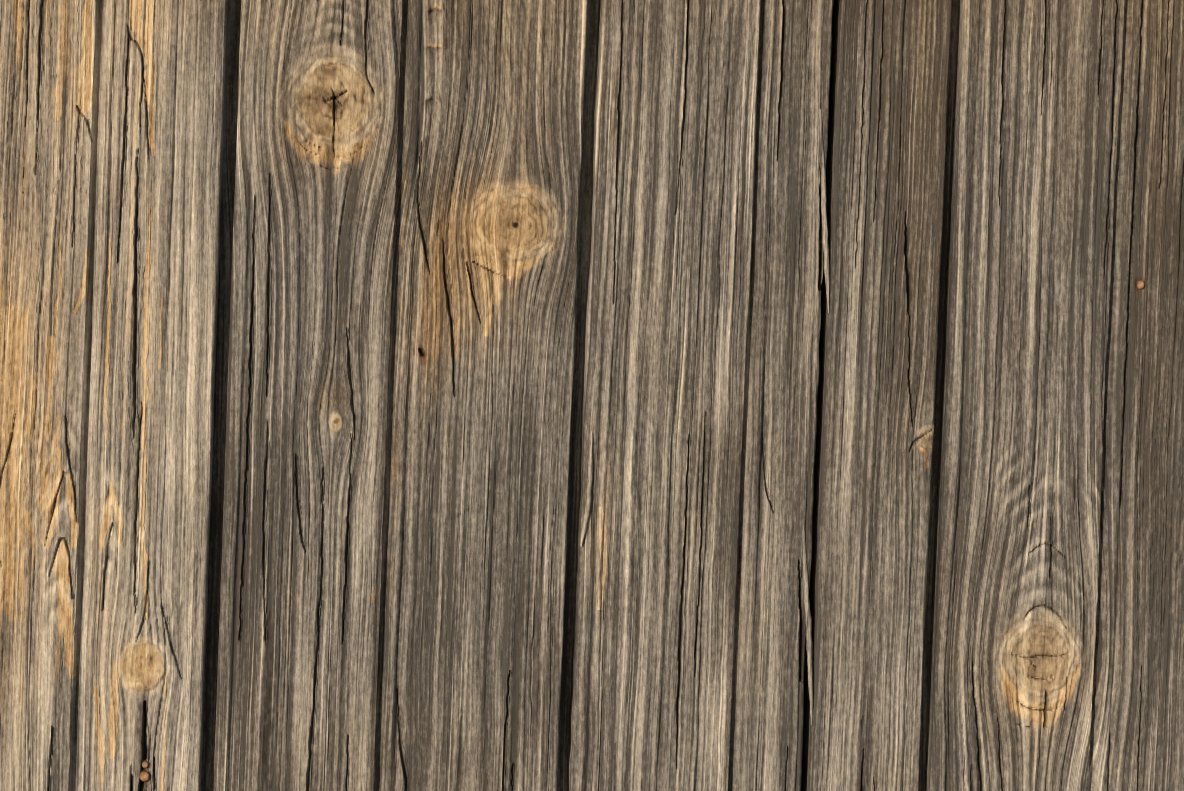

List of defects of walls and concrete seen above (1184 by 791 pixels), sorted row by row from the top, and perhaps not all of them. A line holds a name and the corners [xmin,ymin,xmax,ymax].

crack [0,413,16,487]
crack [44,418,78,599]
crack [71,105,94,243]
crack [102,26,182,679]
crack [238,174,356,791]
crack [417,143,504,396]
crack [797,561,805,680]
crack [816,163,824,291]
crack [855,0,885,263]
crack [904,216,932,451]